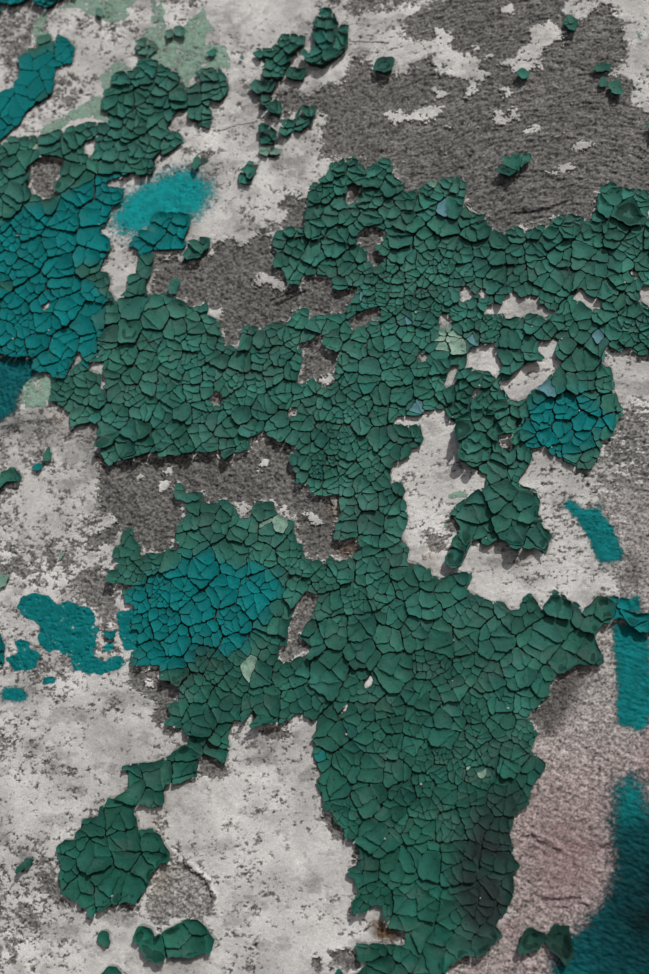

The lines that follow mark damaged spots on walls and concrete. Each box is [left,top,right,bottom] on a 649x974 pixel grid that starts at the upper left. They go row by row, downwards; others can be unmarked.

peeling [165,25,187,39]
peeling [135,37,158,55]
peeling [253,33,306,80]
spalling [261,0,649,233]
crack [510,199,571,215]
crack [270,289,307,307]
peeling [0,57,649,568]
crack [84,545,102,553]
peeling [56,433,649,974]
peeling [15,858,34,874]
crack [542,894,582,902]